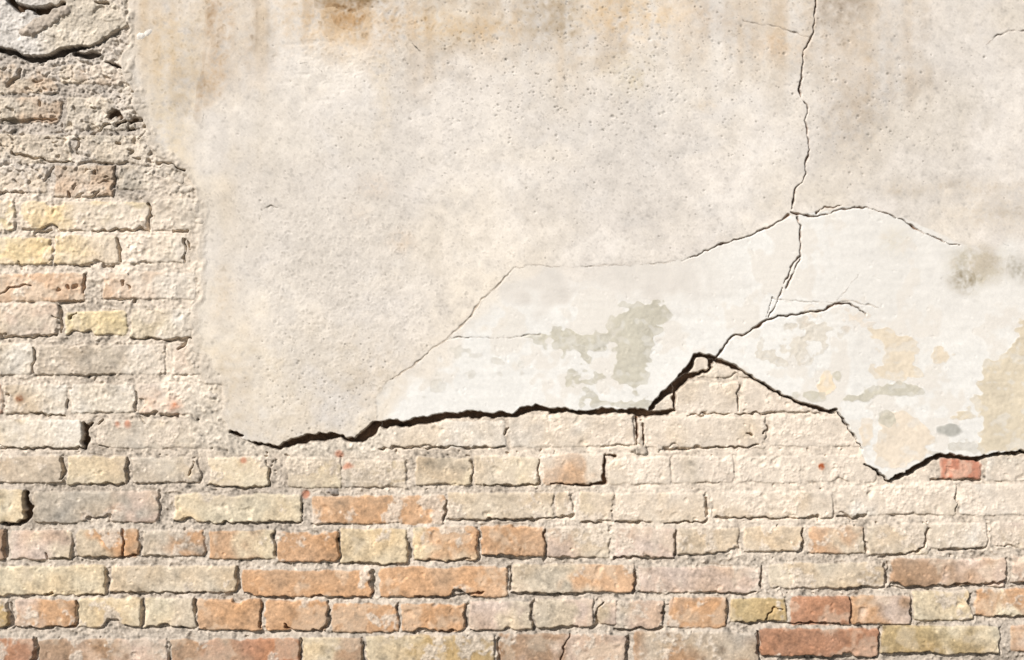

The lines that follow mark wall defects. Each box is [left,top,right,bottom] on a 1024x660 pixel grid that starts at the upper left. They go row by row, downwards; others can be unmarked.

spalling [106,0,230,424]
peeling [523,299,674,410]
crack [229,0,1024,487]
peeling [754,298,1024,469]